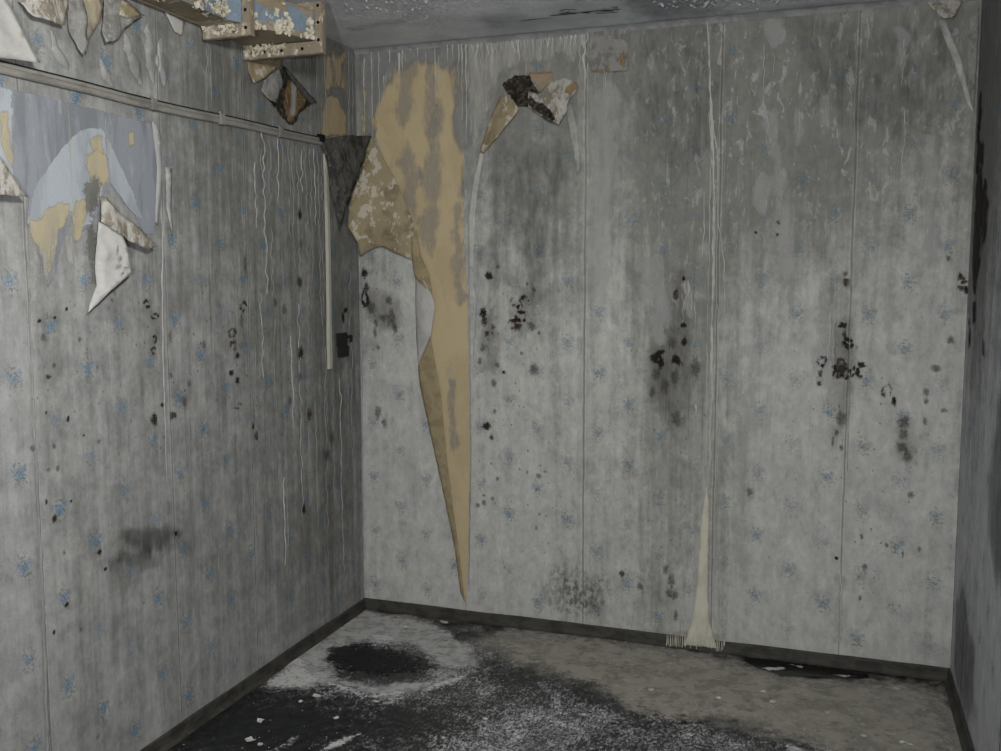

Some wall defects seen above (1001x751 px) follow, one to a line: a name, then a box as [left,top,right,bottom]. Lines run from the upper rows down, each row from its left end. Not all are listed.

spalling [270,67,314,125]
flaking render [322,95,346,137]
spalling [503,73,554,107]
peeling [0,84,173,286]
leakage [958,92,988,345]
peeling [359,45,470,602]
leakage [509,289,535,330]
leakage [650,21,726,651]
leakage [814,308,865,386]